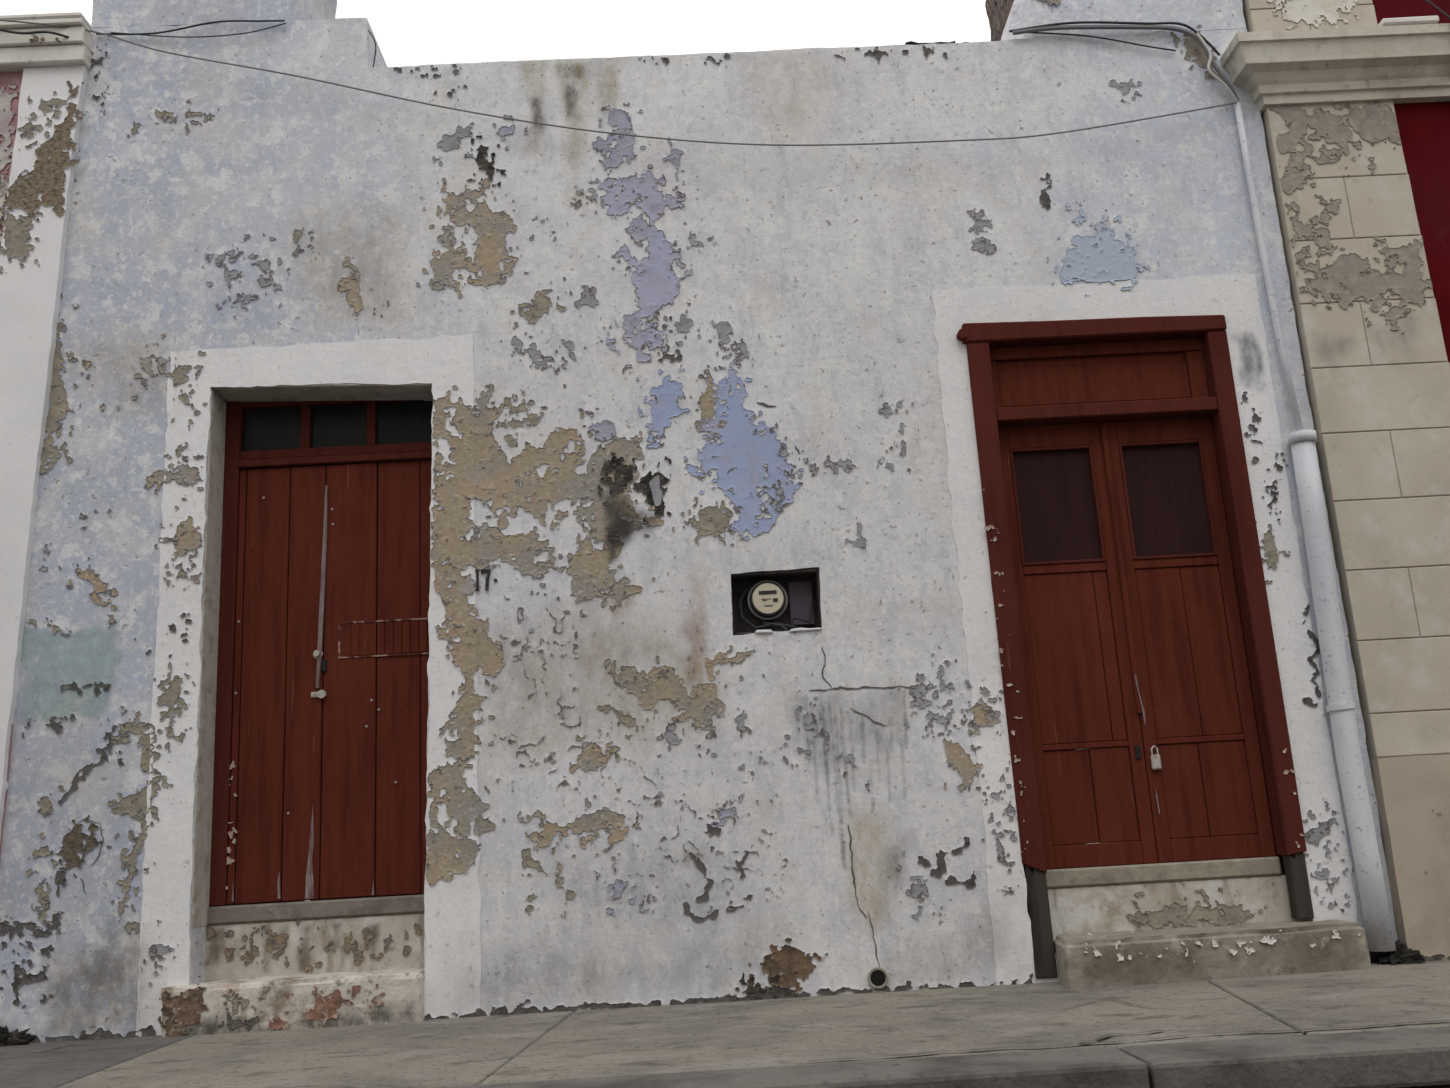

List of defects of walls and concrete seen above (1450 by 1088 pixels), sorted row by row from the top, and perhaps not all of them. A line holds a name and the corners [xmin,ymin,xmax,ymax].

peeling [1267,0,1359,30]
spalling [0,43,111,273]
peeling [1269,101,1433,334]
leakage [607,500,643,553]
spalling [416,101,856,925]
peeling [877,394,919,471]
peeling [1241,391,1290,583]
spalling [0,613,196,1008]
spalling [206,919,421,973]
crack [425,825,1033,1020]
spalling [747,938,828,998]
peeling [1293,792,1350,912]